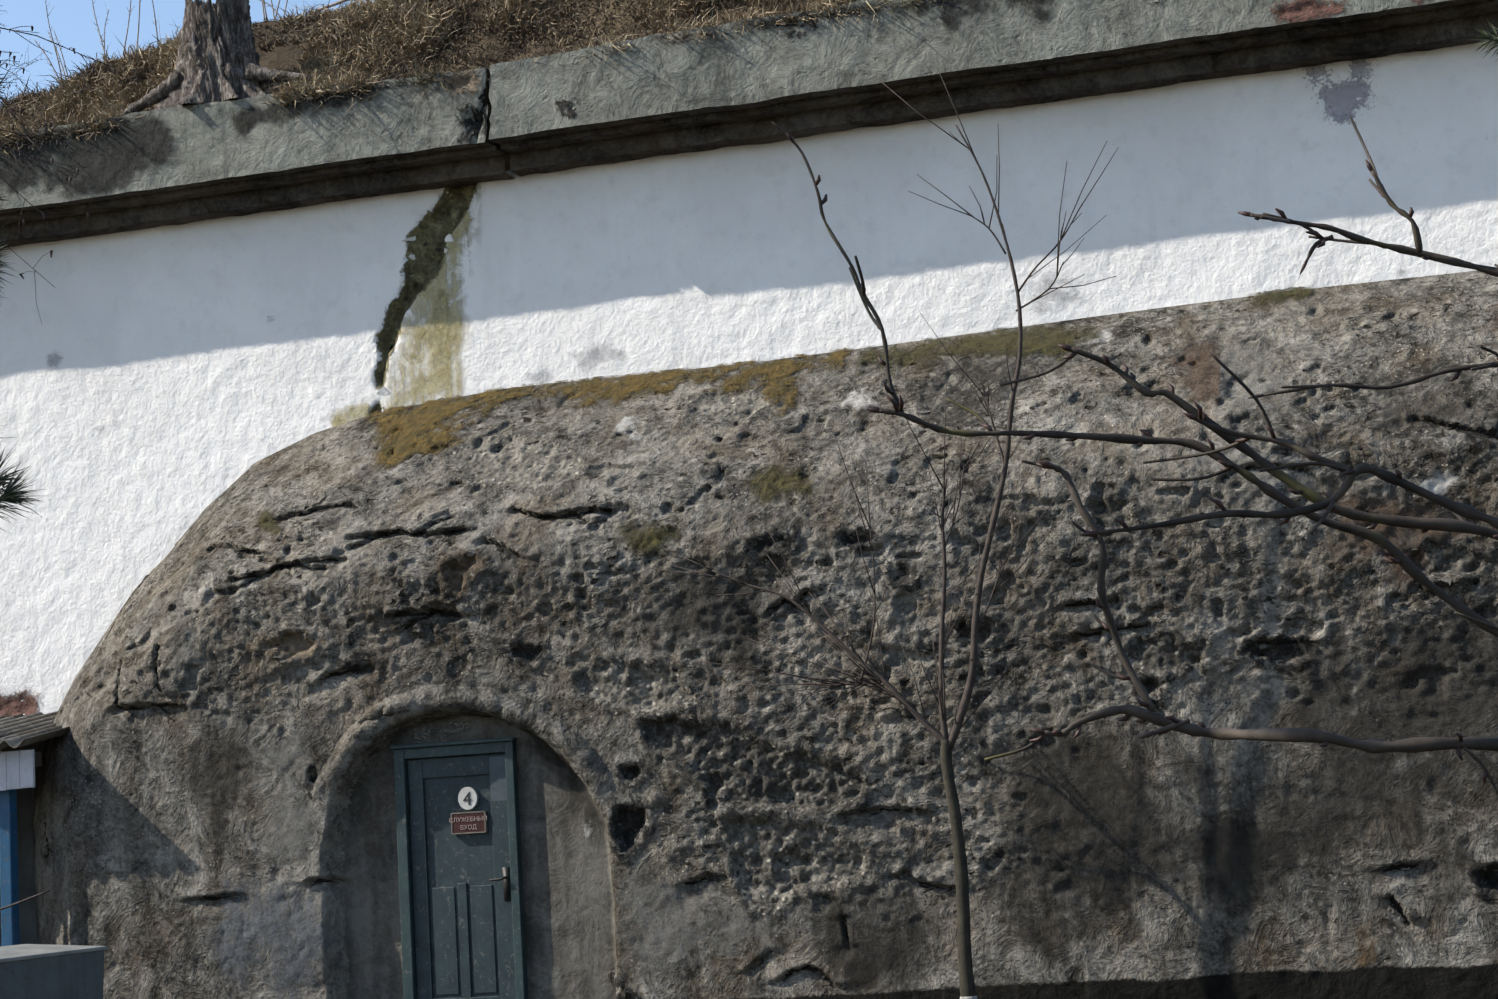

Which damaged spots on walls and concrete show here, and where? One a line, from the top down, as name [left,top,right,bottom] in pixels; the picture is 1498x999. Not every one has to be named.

spalling [1270,0,1348,22]
leakage [0,82,375,195]
crack [469,82,487,144]
crack [370,184,481,414]
leakage [385,211,472,410]
leakage [616,417,642,440]
leakage [841,389,878,409]
crack [213,492,521,592]
crack [513,504,610,525]
leakage [990,603,1498,957]